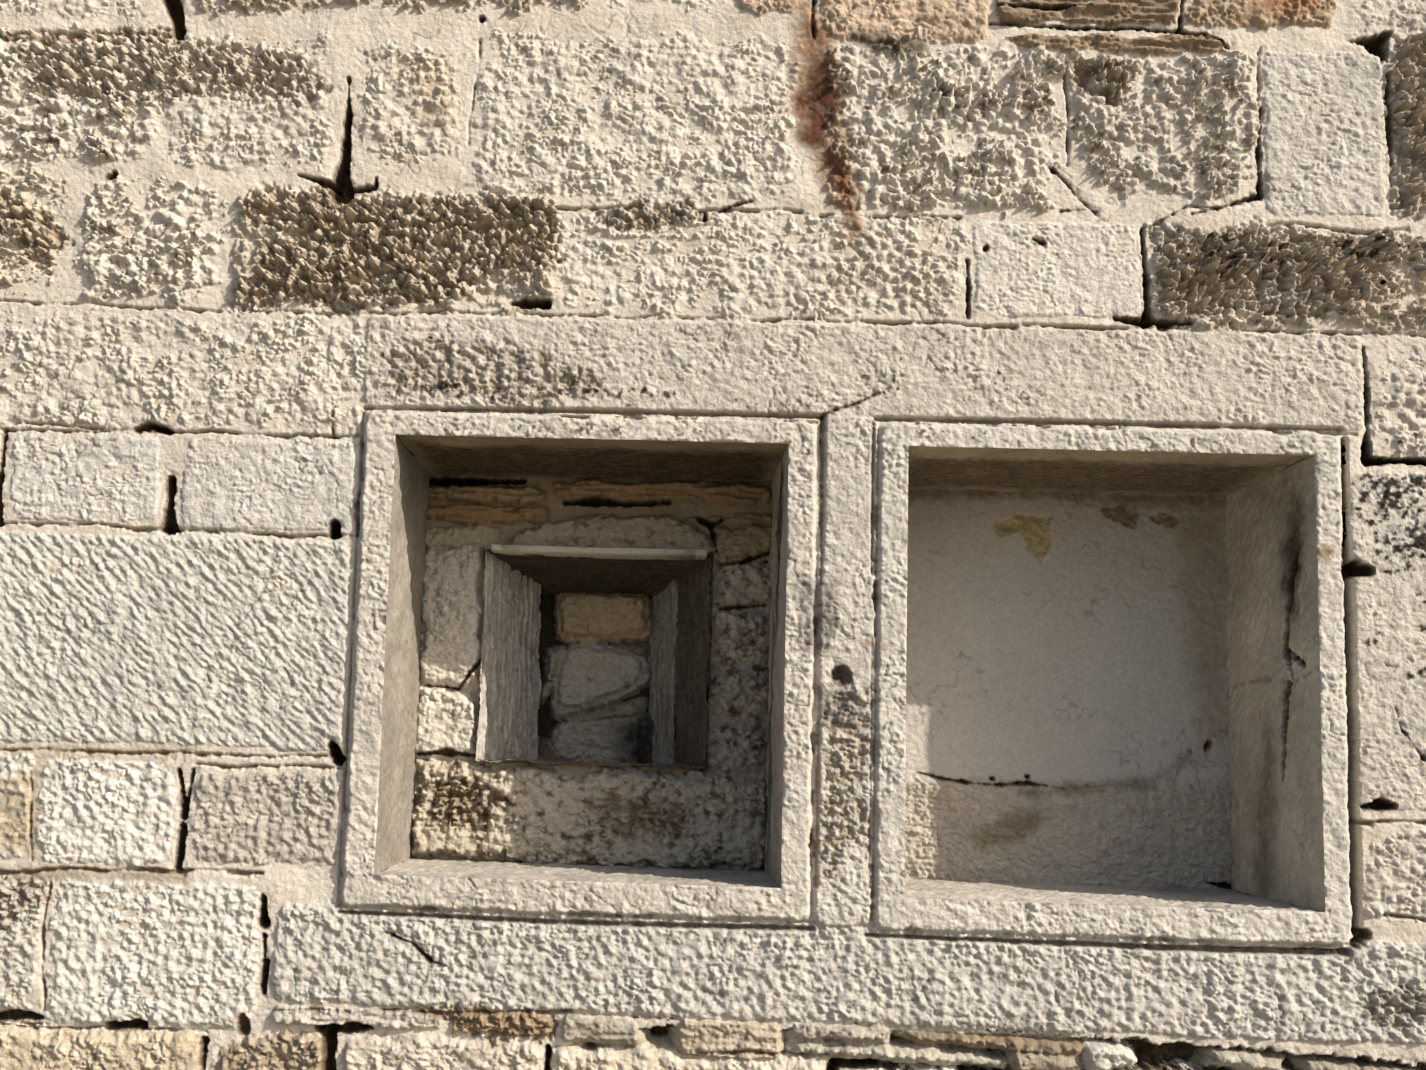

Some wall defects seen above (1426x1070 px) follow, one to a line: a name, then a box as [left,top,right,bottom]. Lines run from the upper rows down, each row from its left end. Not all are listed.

corrosion [791,3,858,238]
crack [1280,562,1306,783]